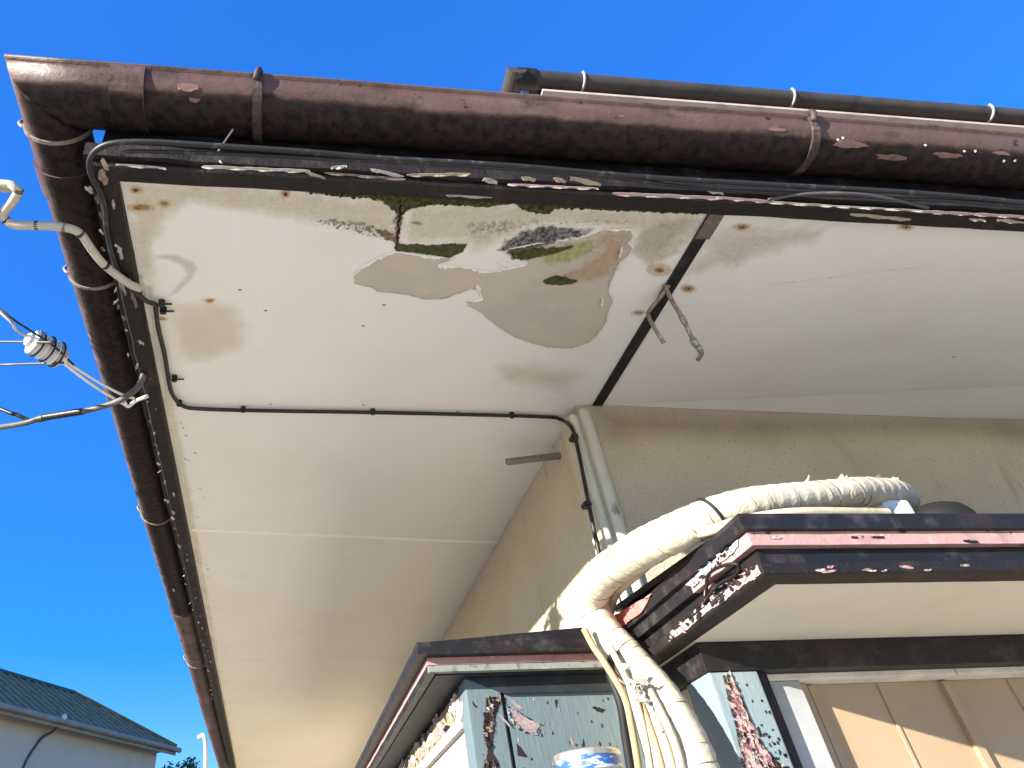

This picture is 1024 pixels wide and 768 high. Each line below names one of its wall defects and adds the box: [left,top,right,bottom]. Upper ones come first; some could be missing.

peeling [177,83,201,103]
peeling [833,139,907,161]
peeling [202,165,470,180]
peeling [482,177,601,190]
peeling [612,191,1024,224]
damp [497,226,592,254]
peeling [352,228,634,349]
peeling [669,539,760,641]
peeling [614,594,651,627]
peeling [399,692,554,768]
peeling [722,671,790,768]